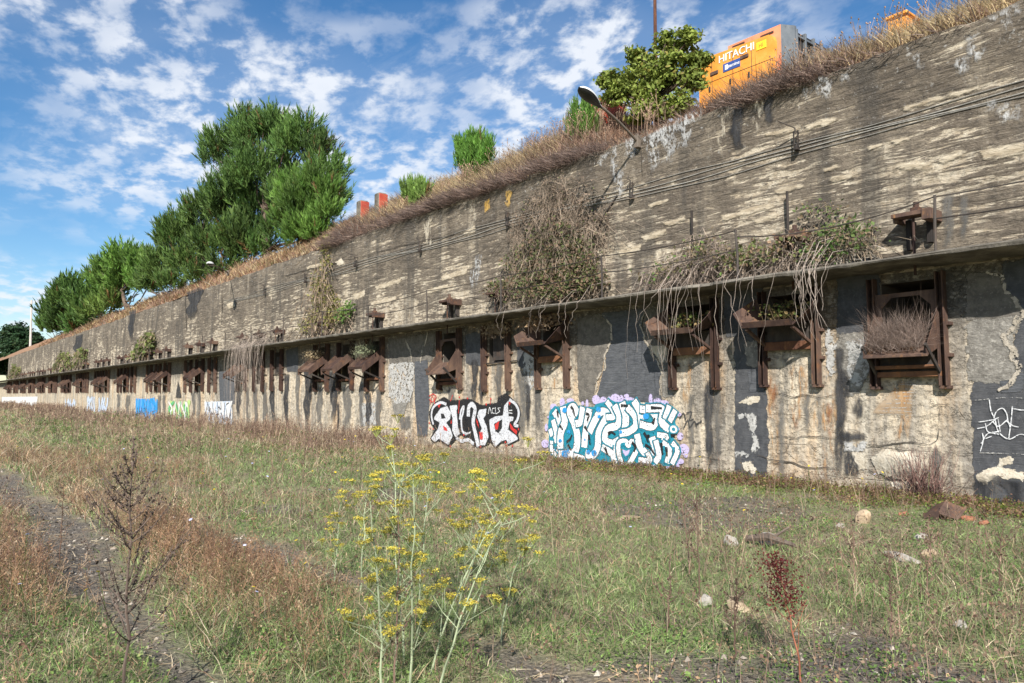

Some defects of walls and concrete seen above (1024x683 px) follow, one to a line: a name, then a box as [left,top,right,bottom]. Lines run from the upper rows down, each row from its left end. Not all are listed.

peeling [723,278,770,479]
water stain [835,348,865,475]
peeling [964,258,1024,506]